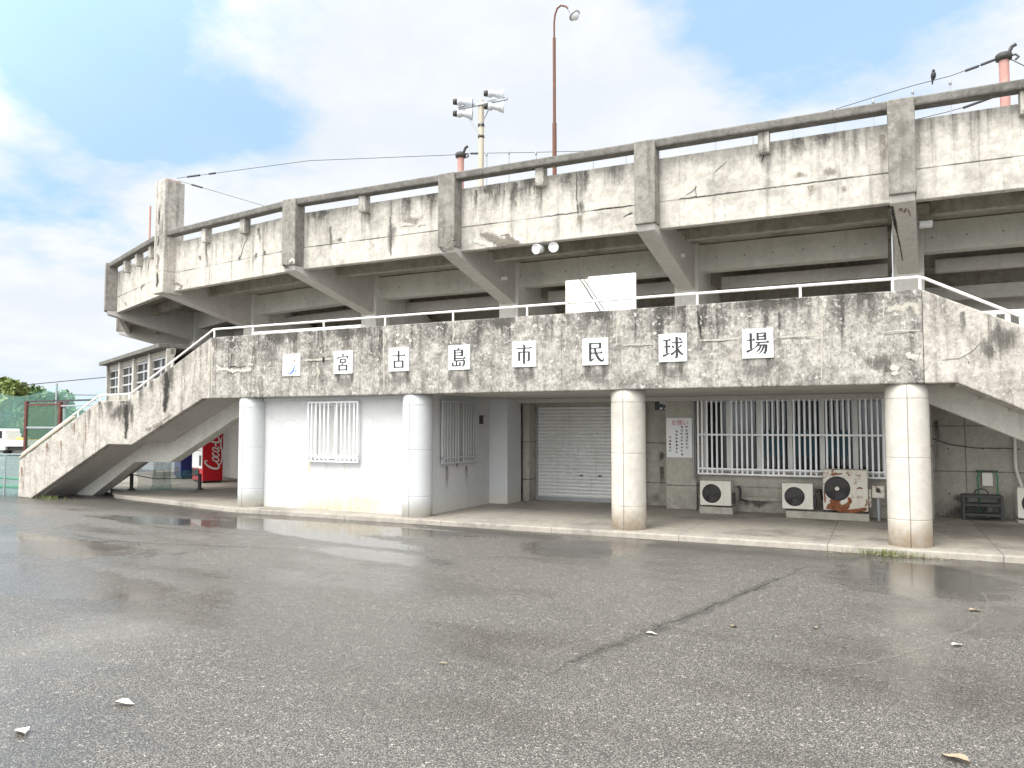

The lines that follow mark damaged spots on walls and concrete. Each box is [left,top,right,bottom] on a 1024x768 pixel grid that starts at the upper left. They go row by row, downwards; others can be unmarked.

leakage [474,178,539,205]
spalling [473,232,522,248]
leakage [88,367,173,438]